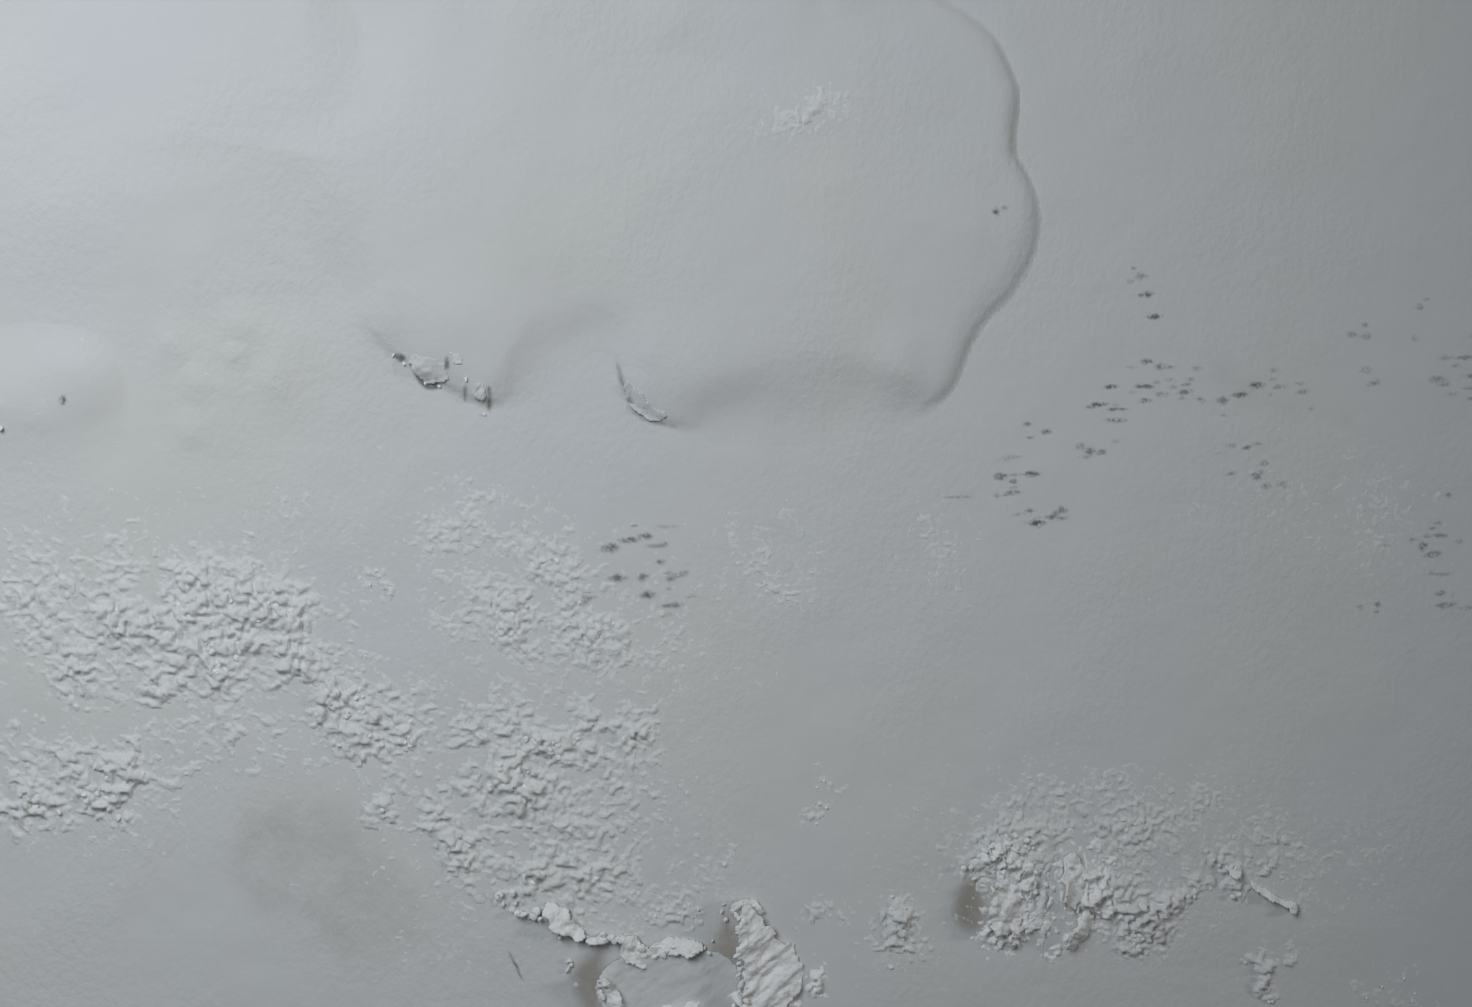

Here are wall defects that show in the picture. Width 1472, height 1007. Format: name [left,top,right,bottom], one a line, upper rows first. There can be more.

peeling [392,353,490,416]
peeling [495,889,829,1007]
peeling [961,815,1126,965]
peeling [1212,858,1298,916]